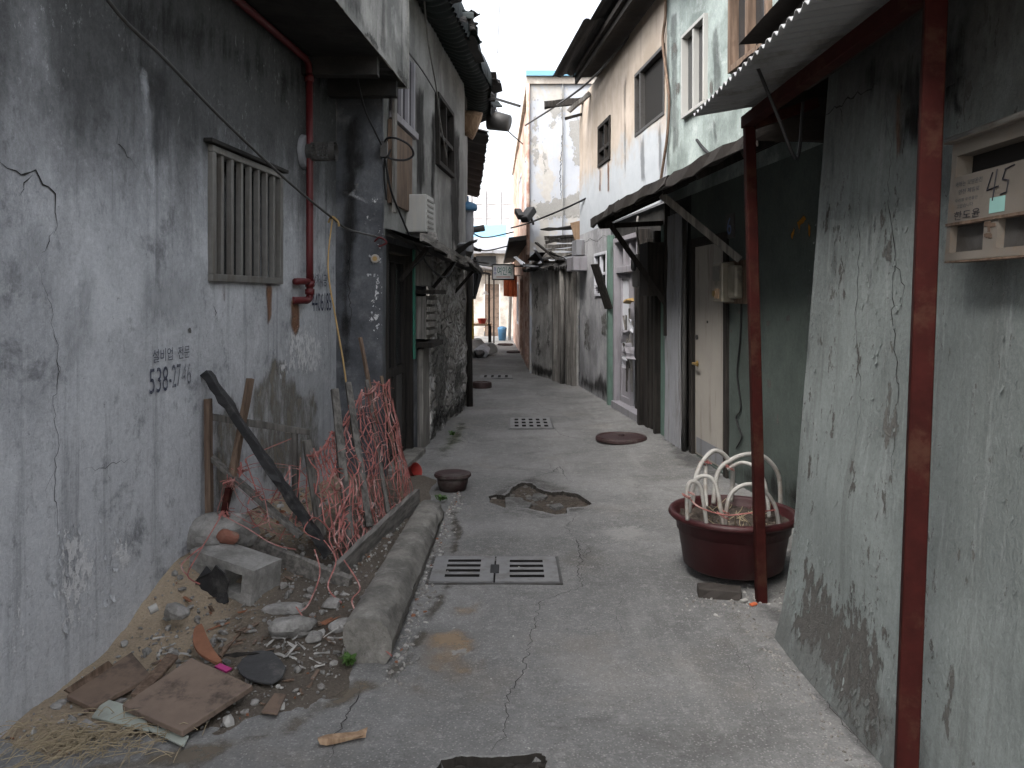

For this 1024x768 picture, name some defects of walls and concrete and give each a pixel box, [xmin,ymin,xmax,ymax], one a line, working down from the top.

peeling [530,97,580,174]
peeling [534,191,580,221]
peeling [367,231,383,331]
crack [0,162,61,585]
peeling [862,369,899,483]
crack [478,525,681,766]
peeling [790,539,889,750]